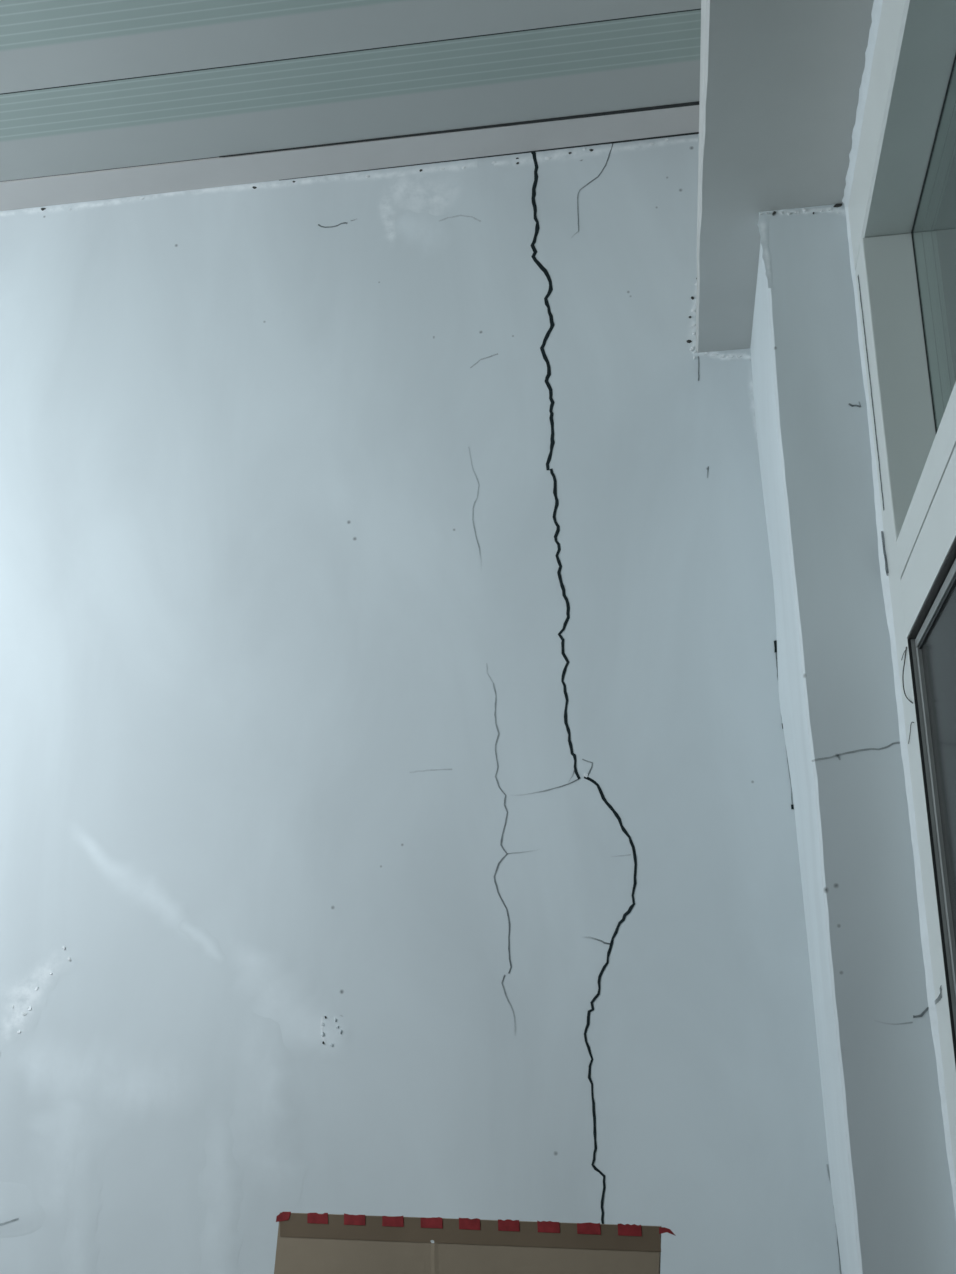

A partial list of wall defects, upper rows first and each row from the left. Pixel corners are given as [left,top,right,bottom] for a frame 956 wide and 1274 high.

crack [494,824,512,981]
crack [530,152,637,1224]